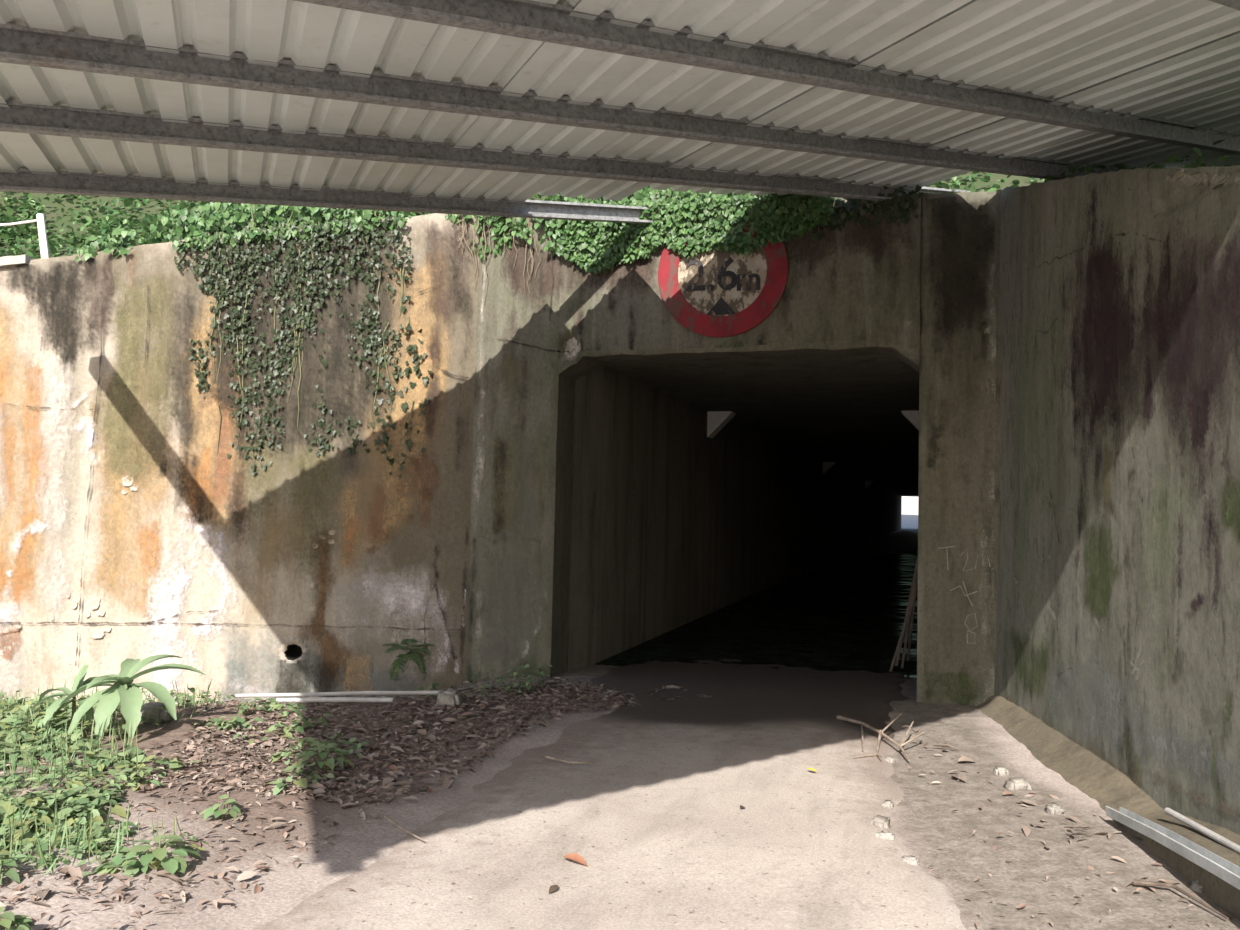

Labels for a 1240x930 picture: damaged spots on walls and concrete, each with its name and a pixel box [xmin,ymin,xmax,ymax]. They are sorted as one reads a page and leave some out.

peeling [0,621,22,659]
rust [0,308,47,599]
water stain [10,256,138,626]
rust [97,365,165,612]
rust [180,290,245,527]
water stain [147,298,450,704]
rust [343,258,447,559]
water stain [427,227,483,320]
water stain [931,198,998,395]
water stain [1072,191,1240,611]